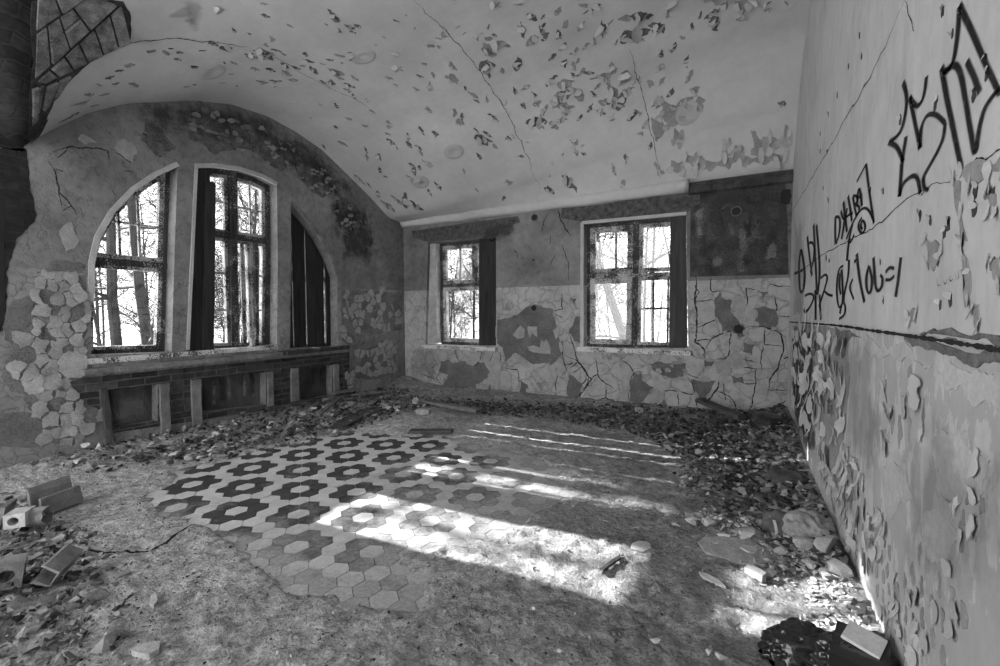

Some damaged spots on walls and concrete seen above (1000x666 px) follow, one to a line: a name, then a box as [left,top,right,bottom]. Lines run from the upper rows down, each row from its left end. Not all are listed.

crack [48,146,135,215]
flaking render [0,0,403,449]
leakage [153,104,349,191]
leakage [333,204,372,257]
crack [423,352,519,385]
crack [414,1,538,182]
crack [542,210,644,401]
spalling [513,0,791,178]
crack [792,1,914,211]
spalling [903,157,1000,368]
peeling [790,310,969,666]
peeling [952,447,986,553]